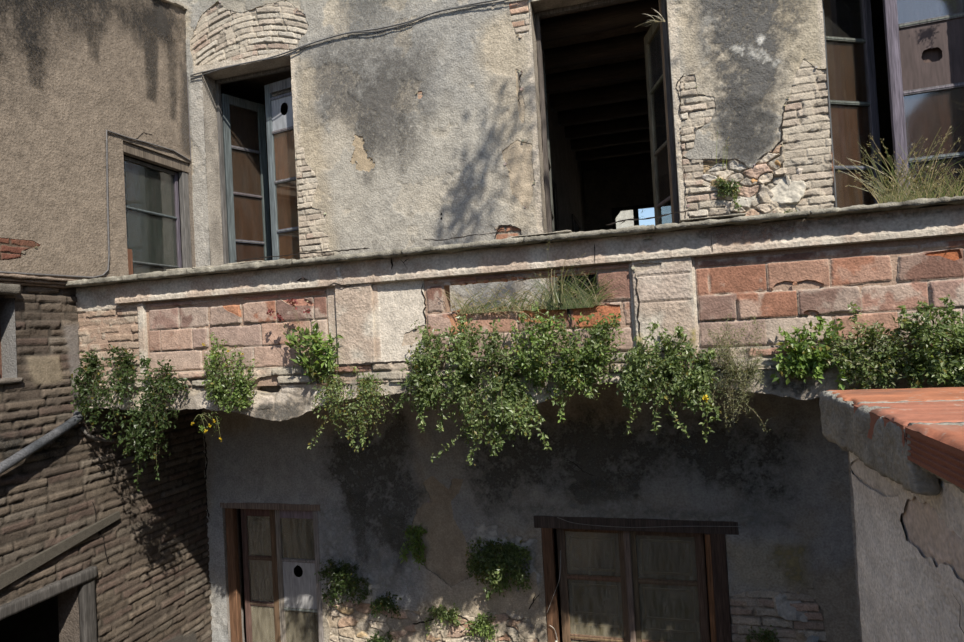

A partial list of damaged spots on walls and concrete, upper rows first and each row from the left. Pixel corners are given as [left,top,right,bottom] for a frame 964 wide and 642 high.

water stain [0,0,186,100]
water stain [171,51,190,153]
spalling [190,0,309,66]
water stain [317,41,420,157]
spalling [509,0,530,38]
water stain [700,0,801,163]
spalling [679,59,835,219]
spalling [0,237,41,260]
spalling [295,146,334,259]
spalling [495,225,522,239]
flaking render [326,476,540,642]
spalling [729,590,827,642]